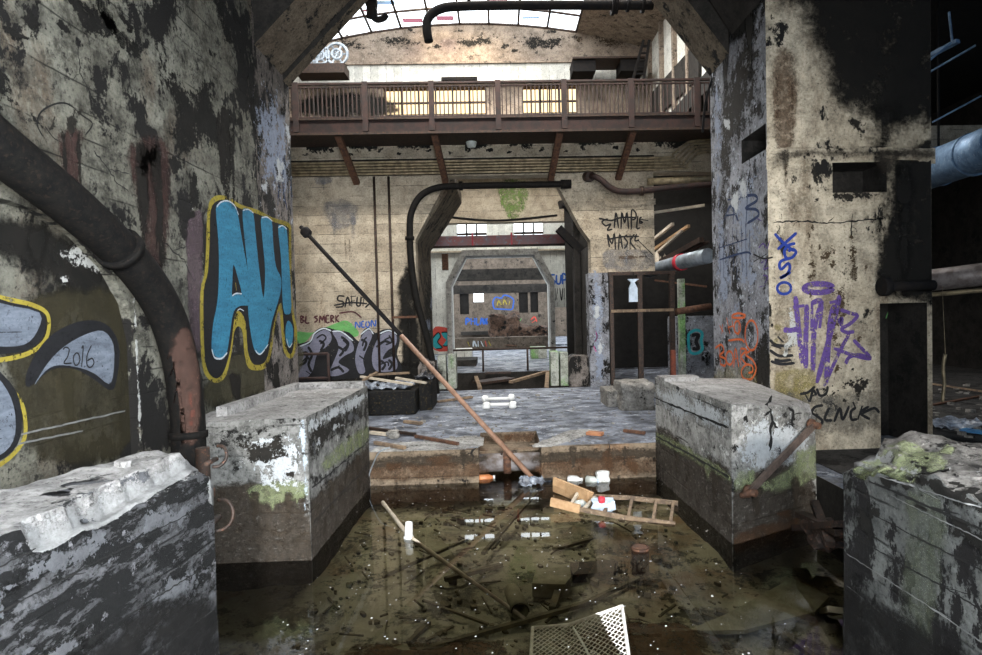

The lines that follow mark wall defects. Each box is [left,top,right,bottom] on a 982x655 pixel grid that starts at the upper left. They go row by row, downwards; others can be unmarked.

rust [772,49,797,149]
rust [58,128,83,184]
crack [774,214,884,235]
crack [765,395,801,451]
spalling [0,458,214,619]
leakage [77,433,488,655]
peeling [48,635,85,655]